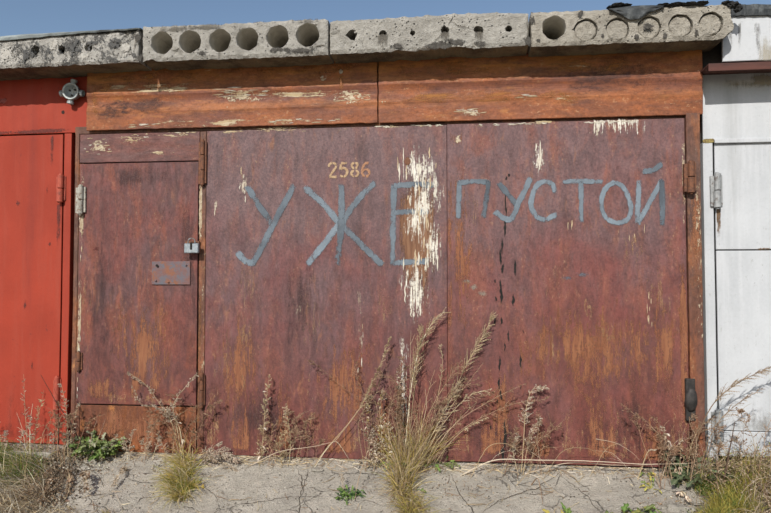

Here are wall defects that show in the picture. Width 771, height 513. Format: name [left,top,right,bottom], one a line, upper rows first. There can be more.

peeling [110,83,196,92]
peeling [121,120,195,142]
peeling [204,119,249,133]
peeling [212,75,371,105]
peeling [584,118,645,135]
peeling [397,148,446,318]
rust [682,144,701,268]
rust [88,299,185,451]
rust [214,318,291,450]
rust [305,344,369,454]
rust [481,376,509,456]
rust [513,266,703,462]